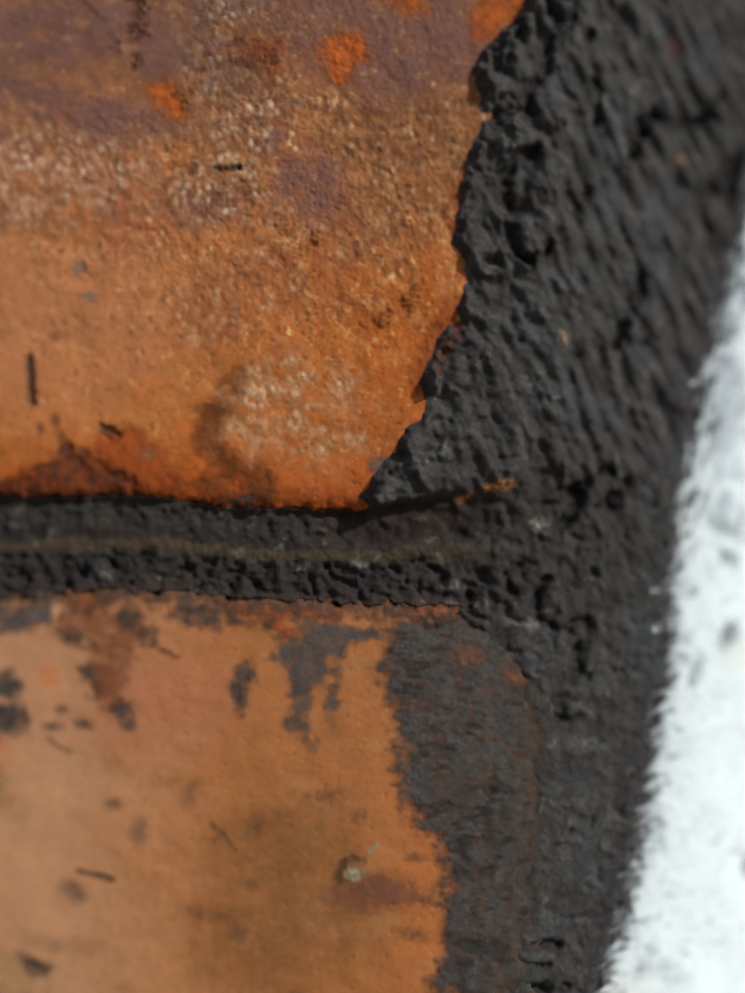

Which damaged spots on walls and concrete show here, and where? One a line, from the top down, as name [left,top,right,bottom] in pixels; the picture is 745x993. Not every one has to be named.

spalling [76,869,114,882]
peeling [334,856,364,884]